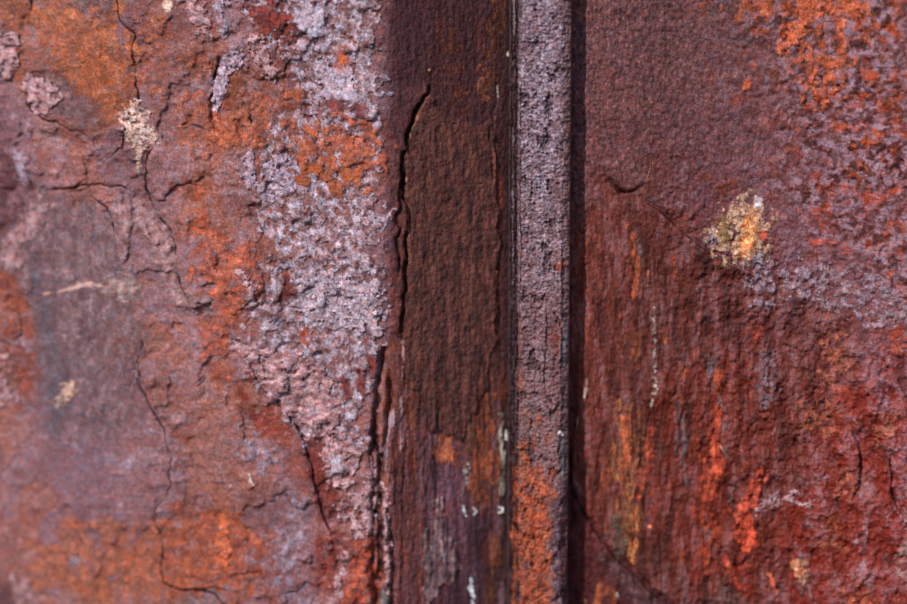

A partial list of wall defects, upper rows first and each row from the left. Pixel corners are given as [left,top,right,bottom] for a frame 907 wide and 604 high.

crack [28,102,79,131]
crack [59,32,192,309]
corrosion [0,0,388,200]
crack [395,90,430,330]
corrosion [736,0,906,135]
corrosion [25,500,287,604]
crack [128,341,225,597]
corrosion [169,171,340,519]
crack [255,377,327,525]
crack [370,362,395,604]
corrosion [601,223,667,564]
corrosion [663,364,819,601]